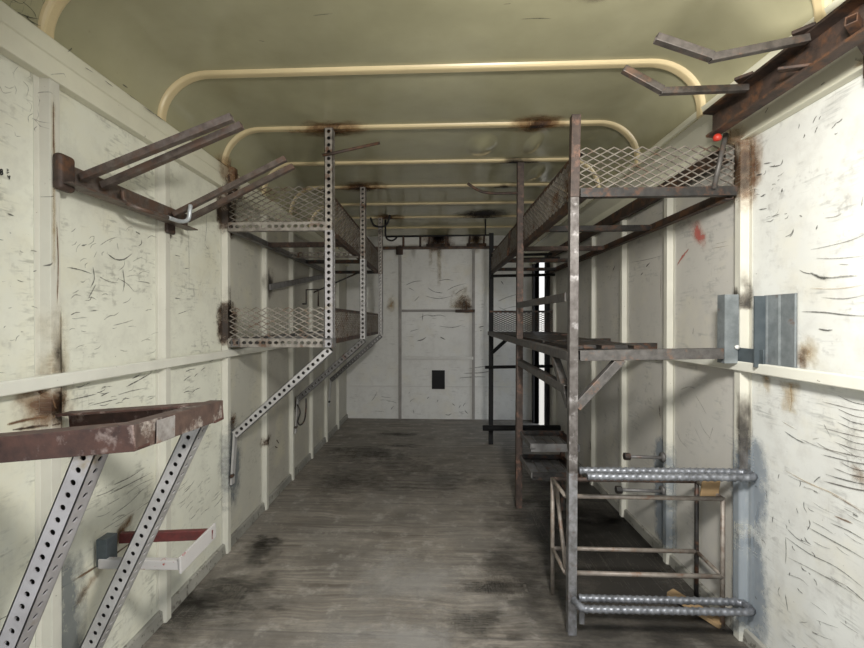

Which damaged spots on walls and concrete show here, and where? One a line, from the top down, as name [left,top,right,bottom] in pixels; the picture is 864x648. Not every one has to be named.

corrosion [307,123,354,135]
corrosion [519,116,558,132]
corrosion [727,130,760,198]
corrosion [217,300,237,345]
corrosion [9,389,66,430]